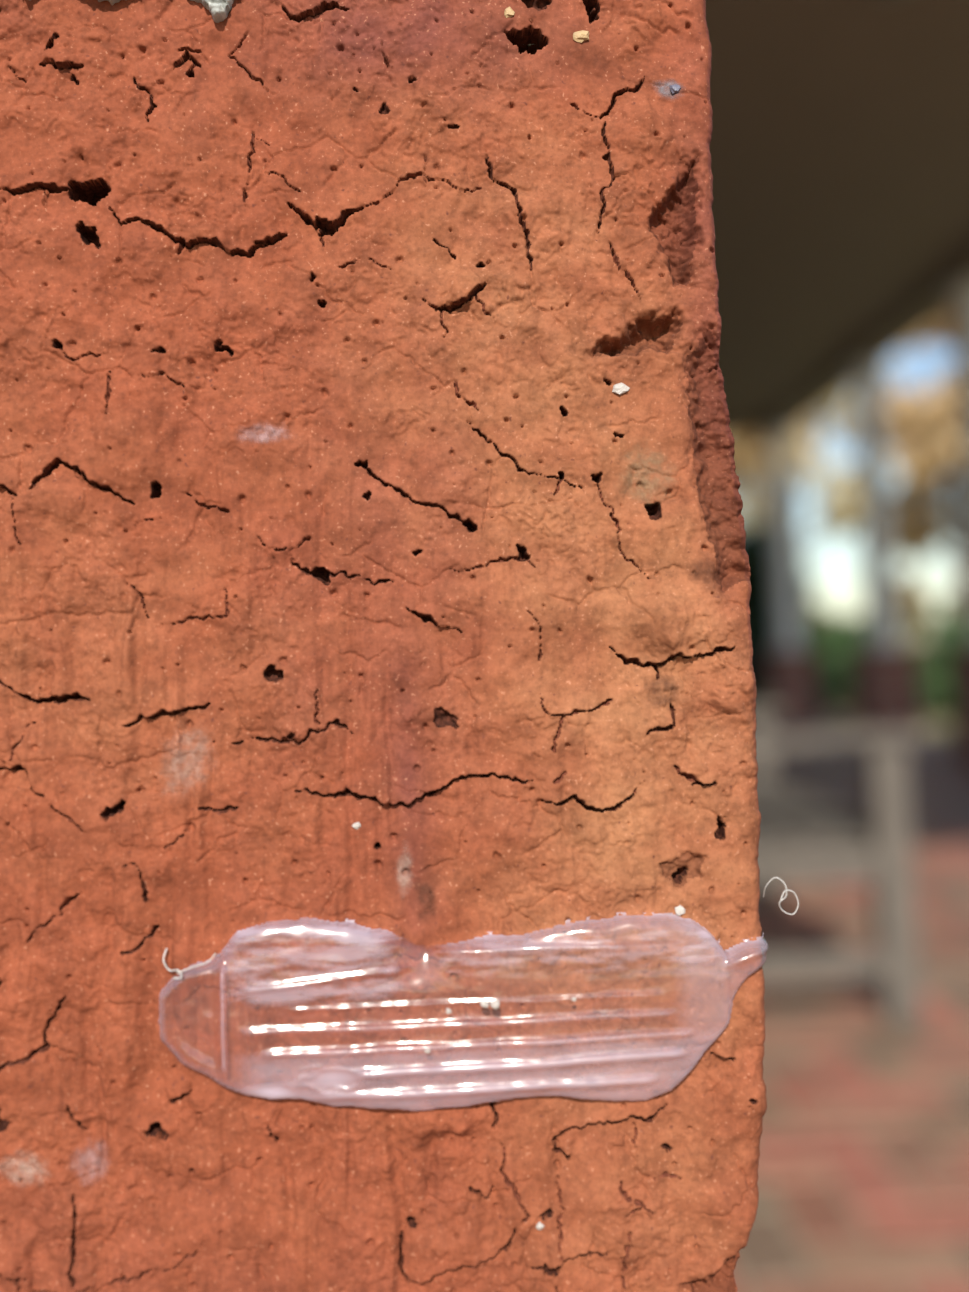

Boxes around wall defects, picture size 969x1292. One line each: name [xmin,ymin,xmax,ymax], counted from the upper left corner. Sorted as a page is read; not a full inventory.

crack [174,35,269,92]
crack [0,182,76,198]
crack [108,133,533,271]
crack [571,82,643,293]
crack [423,284,490,337]
crack [0,457,153,545]
crack [364,468,460,520]
crack [454,380,649,578]
crack [609,646,734,735]
crack [0,680,89,831]
crack [295,698,636,813]
crack [399,1098,681,1292]